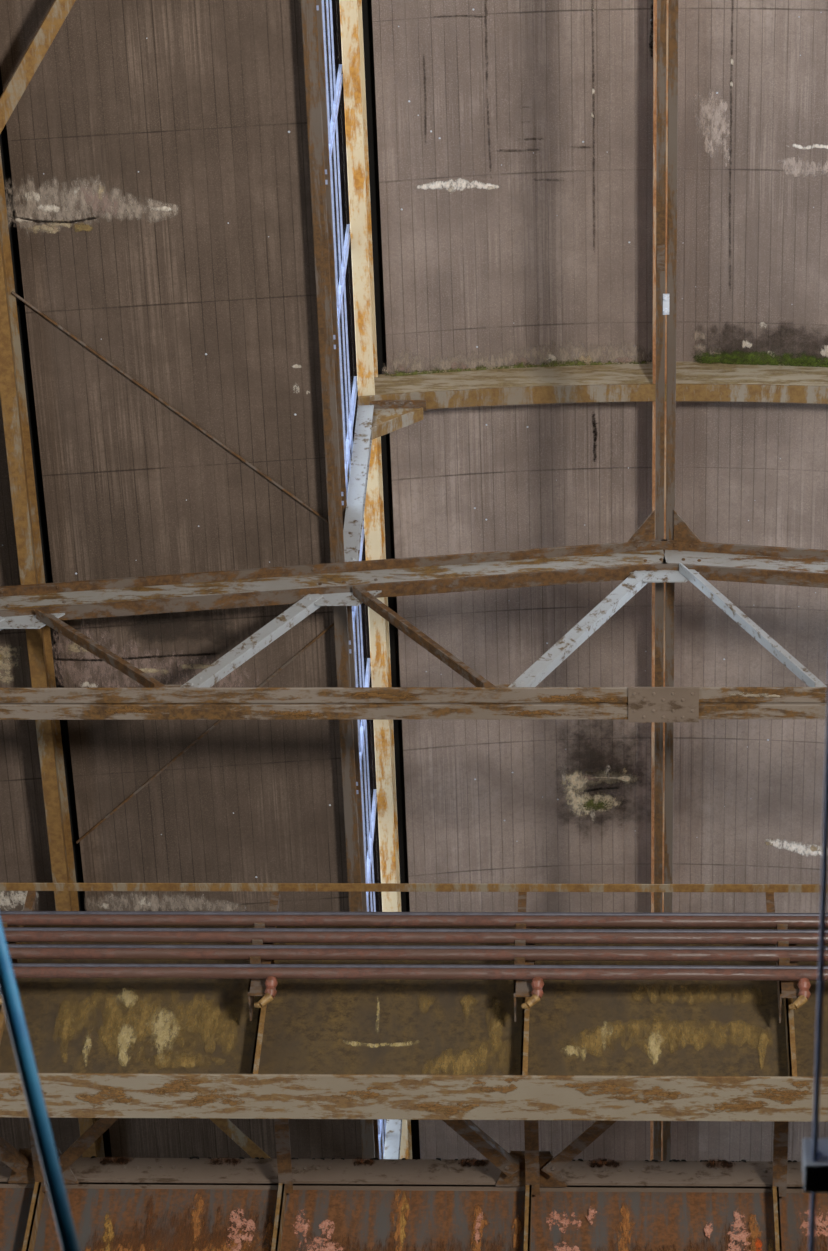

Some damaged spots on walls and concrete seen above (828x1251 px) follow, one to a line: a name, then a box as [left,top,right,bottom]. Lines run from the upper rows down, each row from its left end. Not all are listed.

damp [5,177,178,234]
damp [417,178,499,192]
damp [765,839,822,857]
damp [55,987,239,1069]
peeling [148,1079,245,1108]
peeling [416,1078,519,1117]
peeling [564,1083,683,1104]
peeling [705,1081,811,1114]
corrosion [85,1192,273,1251]
corrosion [292,1189,522,1251]
corrosion [546,1206,597,1251]
corrosion [612,1204,773,1251]